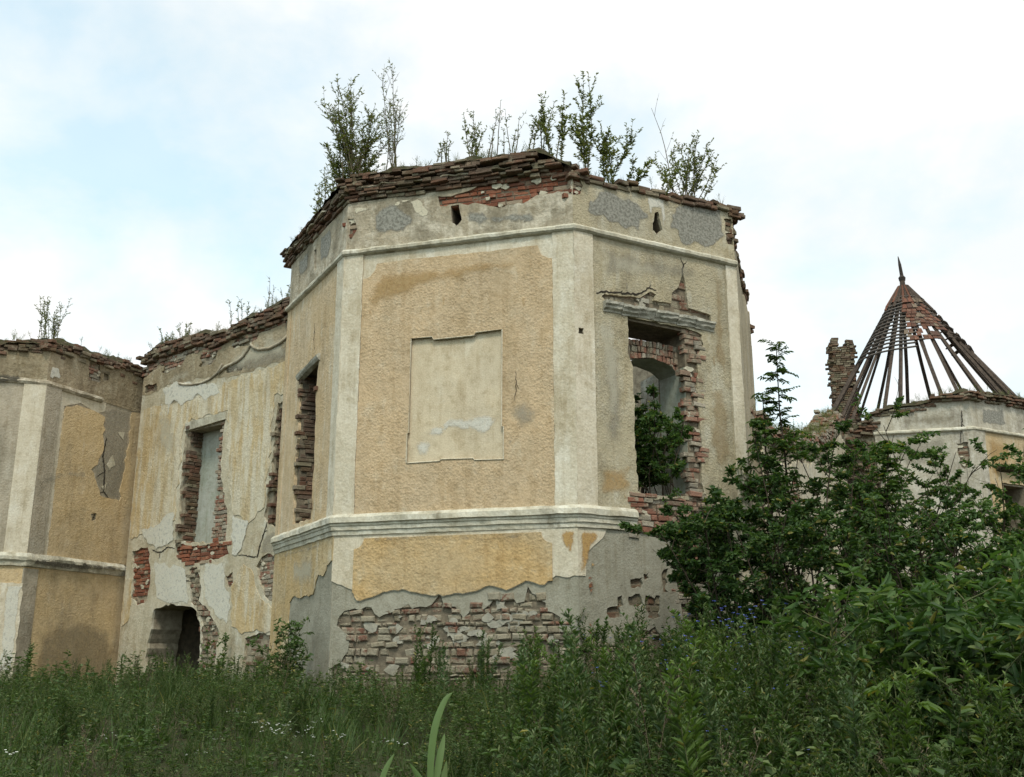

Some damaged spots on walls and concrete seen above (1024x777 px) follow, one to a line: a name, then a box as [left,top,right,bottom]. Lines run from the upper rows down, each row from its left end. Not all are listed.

flaking render [439,170,582,210]
flaking render [605,276,706,316]
peeling [145,332,280,416]
crack [97,438,108,497]
flaking render [330,329,715,697]
peeling [132,512,248,680]
flaking render [259,554,274,600]